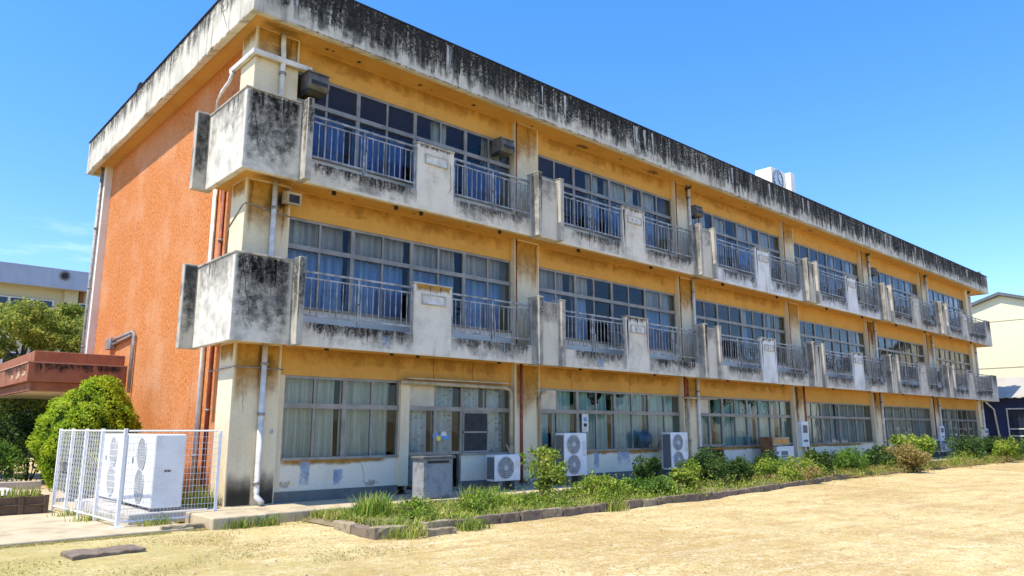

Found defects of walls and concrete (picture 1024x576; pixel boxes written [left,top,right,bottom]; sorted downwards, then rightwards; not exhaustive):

water stain [90,0,233,150]
water stain [195,113,210,168]
water stain [228,89,315,160]
water stain [281,0,987,287]
water stain [184,262,216,327]
water stain [237,253,305,328]
water stain [221,343,280,386]
water stain [309,322,405,339]
water stain [460,338,529,351]
water stain [182,471,273,507]